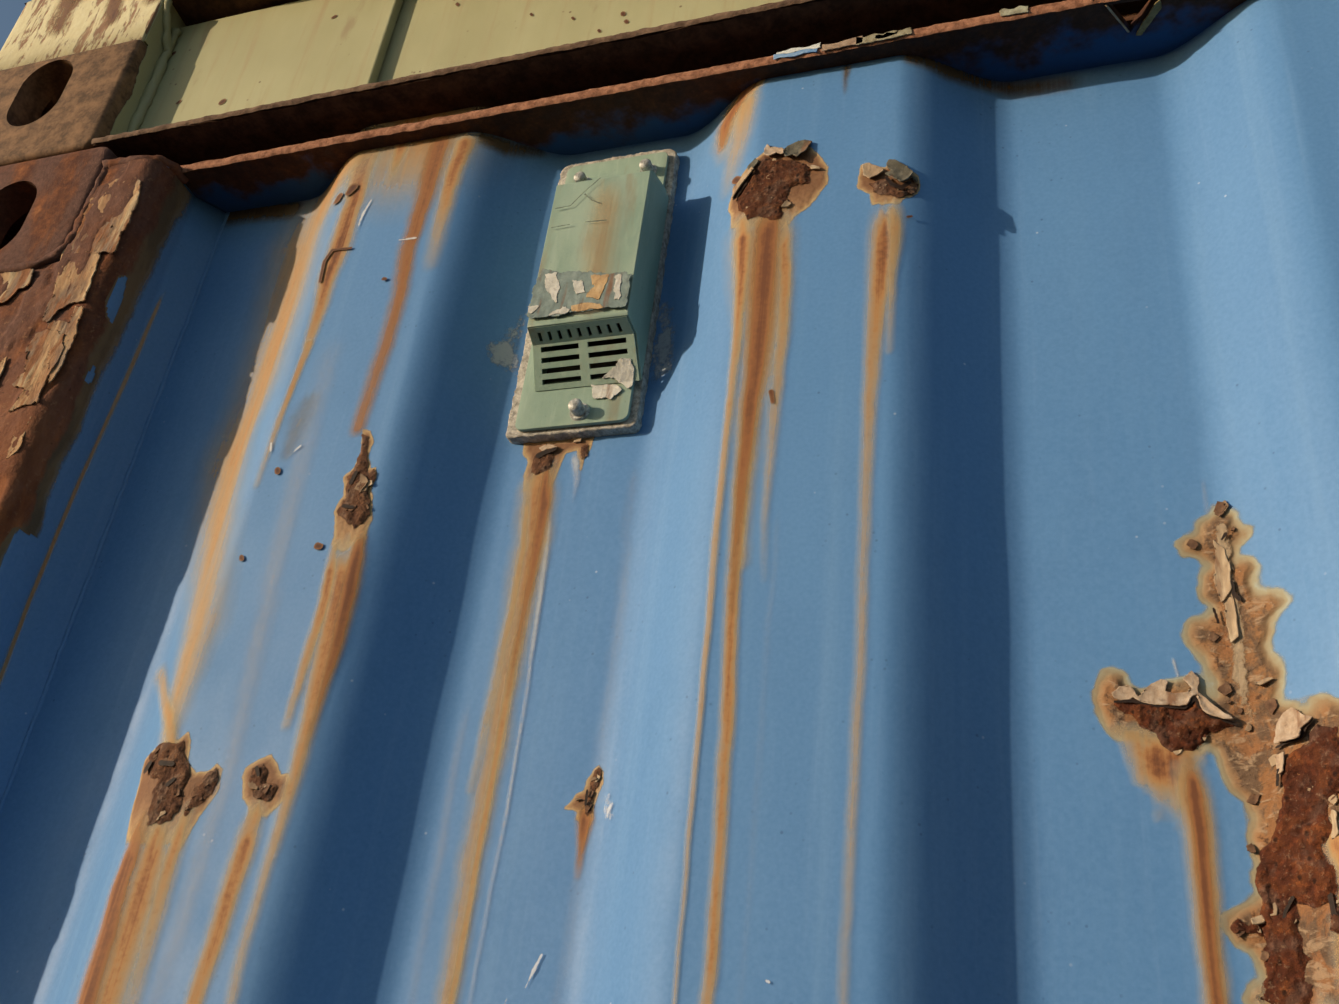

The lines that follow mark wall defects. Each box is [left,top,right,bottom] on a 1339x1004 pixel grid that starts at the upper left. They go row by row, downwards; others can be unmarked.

rust [362,107,474,132]
rust [719,79,765,157]
rust [905,55,1070,94]
peeling [0,179,142,459]
rust [0,158,191,683]
rust [78,133,542,1004]
rust [441,437,594,1004]
rust [564,766,604,864]
peeling [1091,500,1339,1004]